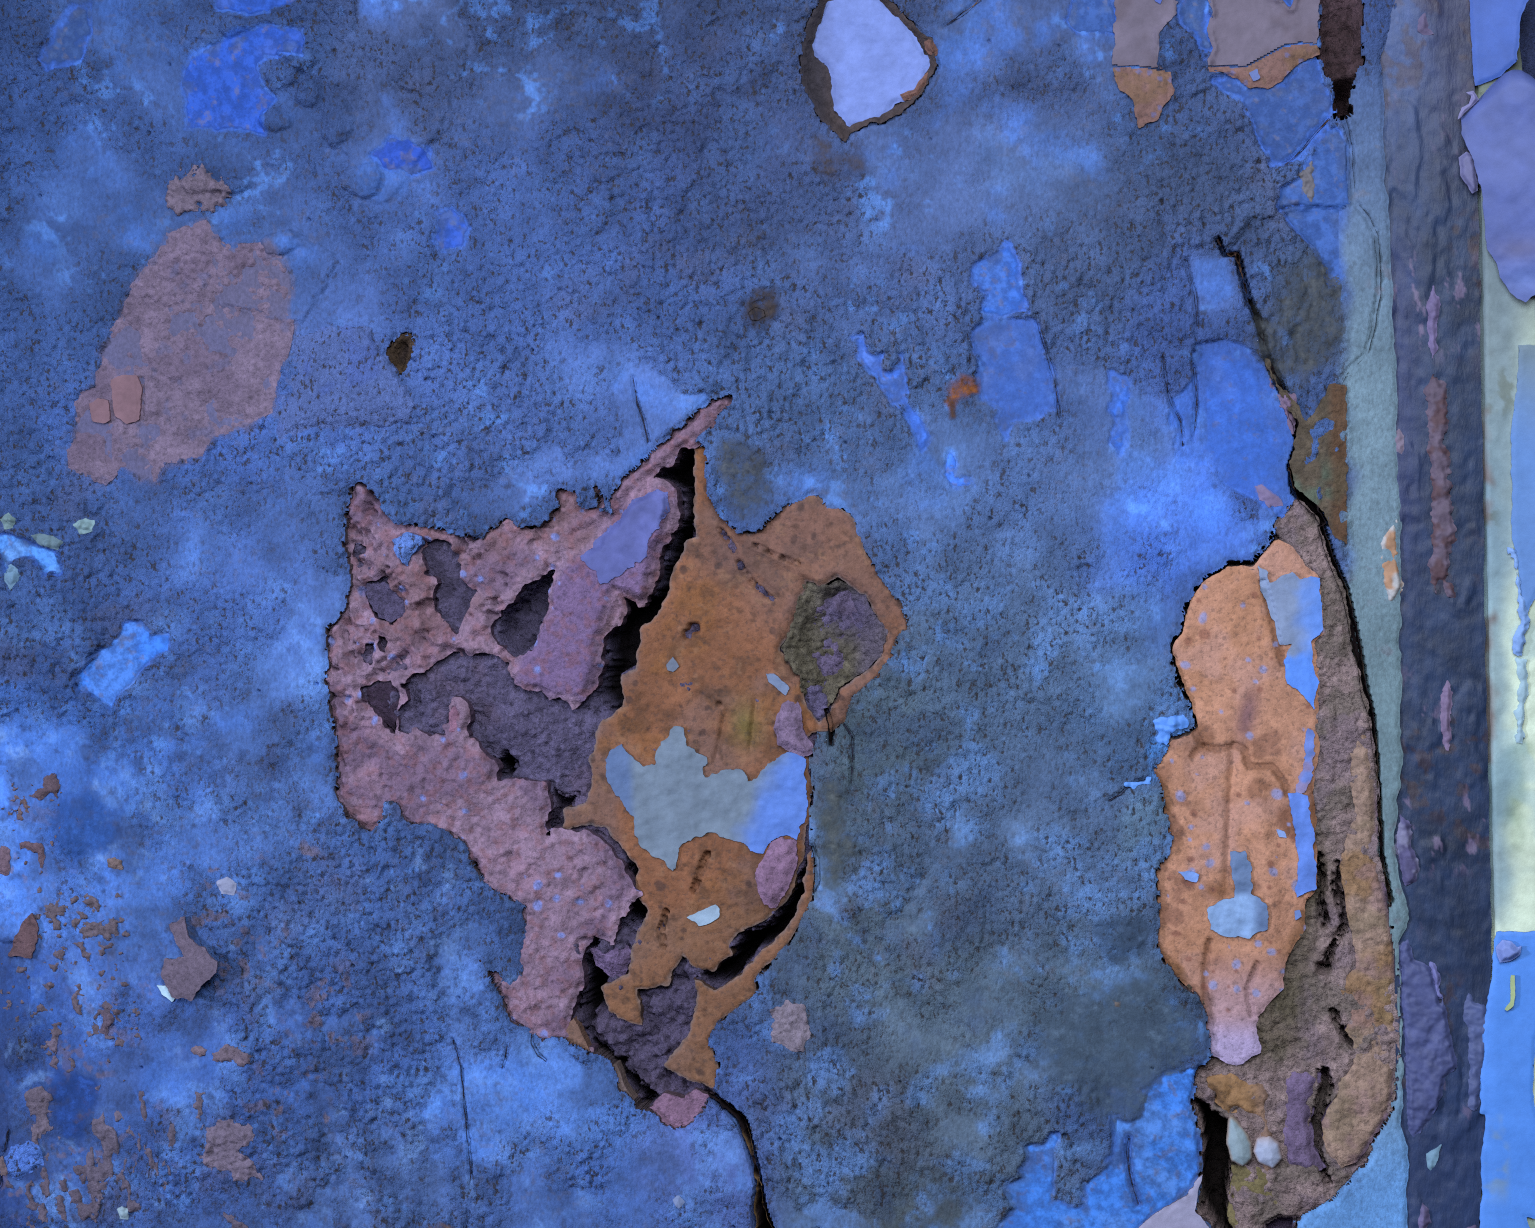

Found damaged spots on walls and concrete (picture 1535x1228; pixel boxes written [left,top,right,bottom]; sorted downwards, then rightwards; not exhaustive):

peeling [183,0,304,134]
flaking render [800,0,939,143]
peeling [1068,0,1320,129]
peeling [1458,0,1535,302]
flaking render [67,220,294,486]
crack [1162,201,1392,902]
peeling [77,622,169,706]
flaking render [325,394,909,1128]
flaking render [1008,345,1535,1228]
flaking render [8,913,39,958]
flaking render [157,916,218,1002]
crack [708,1092,775,1228]